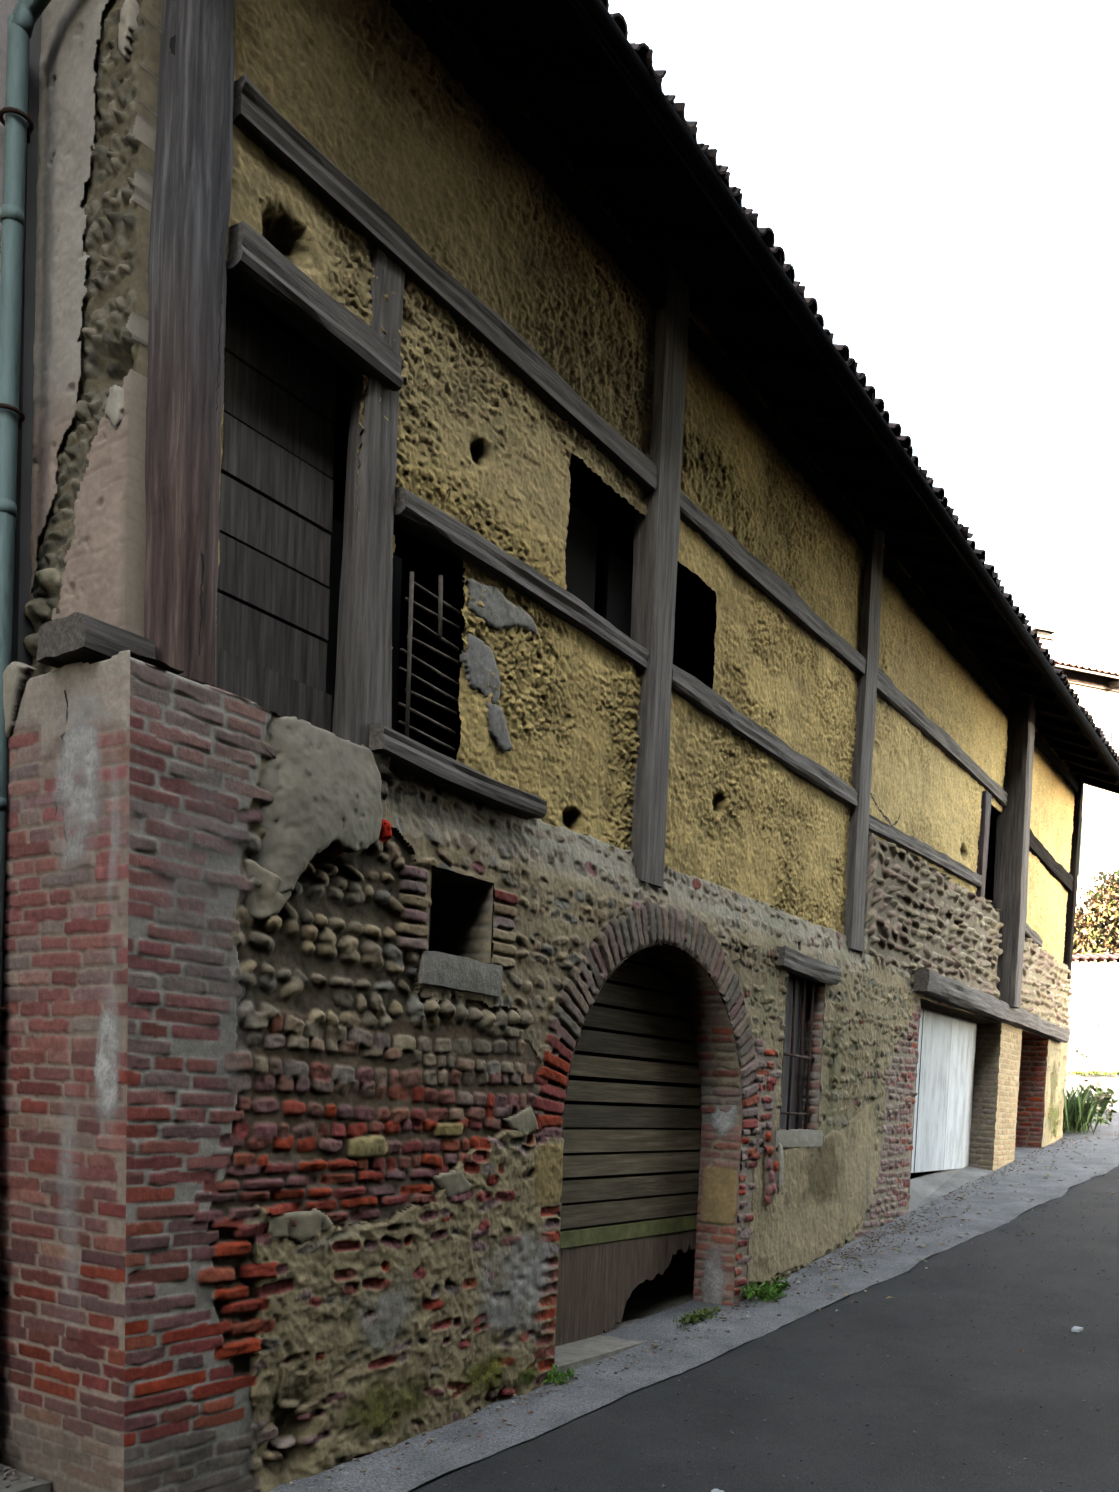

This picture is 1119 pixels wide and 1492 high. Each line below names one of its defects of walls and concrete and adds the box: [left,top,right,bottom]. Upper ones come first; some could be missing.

spalling [3,0,163,738]
spalling [254,823,547,1244]